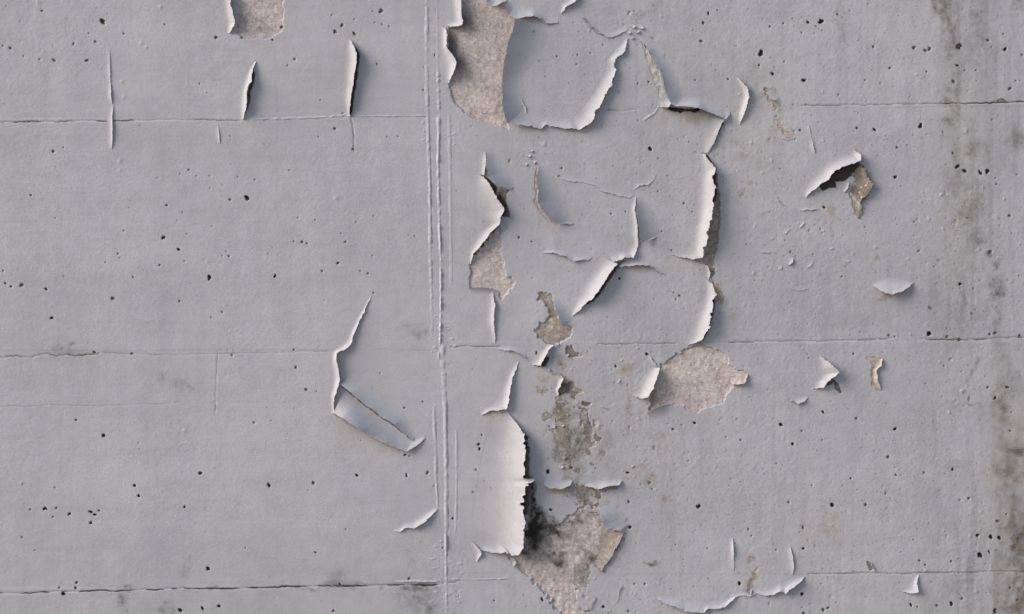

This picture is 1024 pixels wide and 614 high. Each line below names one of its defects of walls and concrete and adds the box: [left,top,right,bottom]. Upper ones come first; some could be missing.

peeling [239,62,256,119]
peeling [222,0,284,39]
peeling [342,40,360,149]
peeling [441,0,628,130]
peeling [631,39,749,422]
peeling [762,147,874,253]
peeling [330,296,425,452]
peeling [469,149,666,614]
peeling [783,356,842,404]
peeling [393,507,437,532]
water stain [523,487,560,554]
peeling [658,575,804,613]